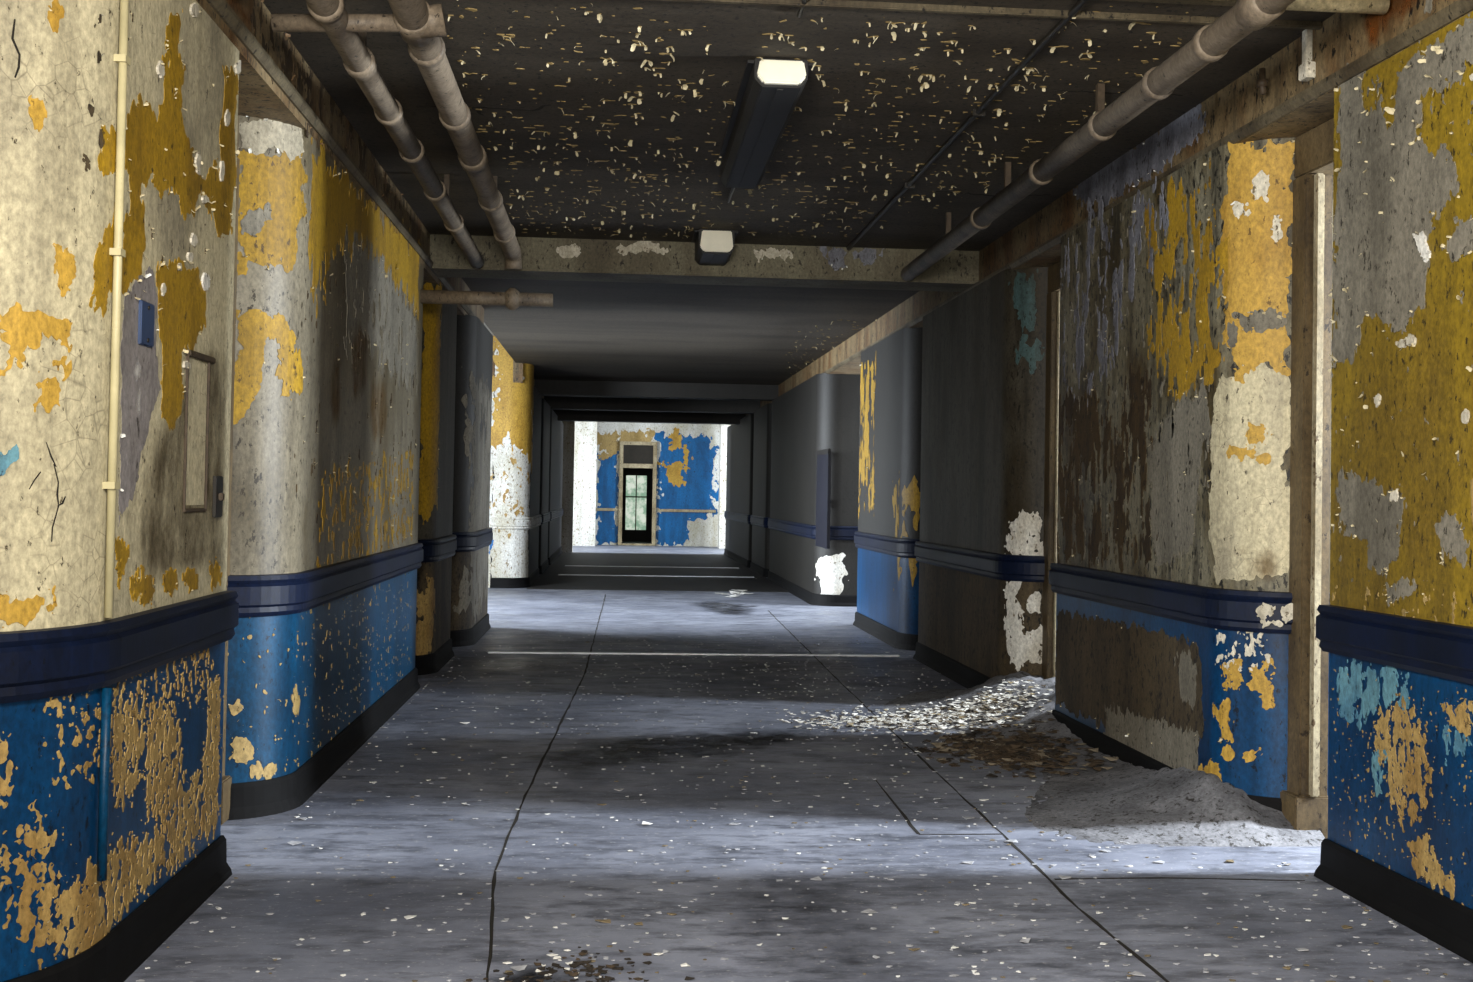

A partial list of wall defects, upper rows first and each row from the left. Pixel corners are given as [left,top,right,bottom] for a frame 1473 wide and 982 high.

peeling [0,302,73,413]
peeling [28,95,47,132]
peeling [53,0,442,608]
peeling [453,336,534,623]
peeling [596,427,720,546]
peeling [447,0,1182,271]
peeling [1004,104,1295,585]
peeling [1356,382,1402,420]
flaking render [1328,13,1473,378]
flaking render [1331,416,1473,624]
peeling [0,573,435,970]
flaking render [1003,581,1293,781]